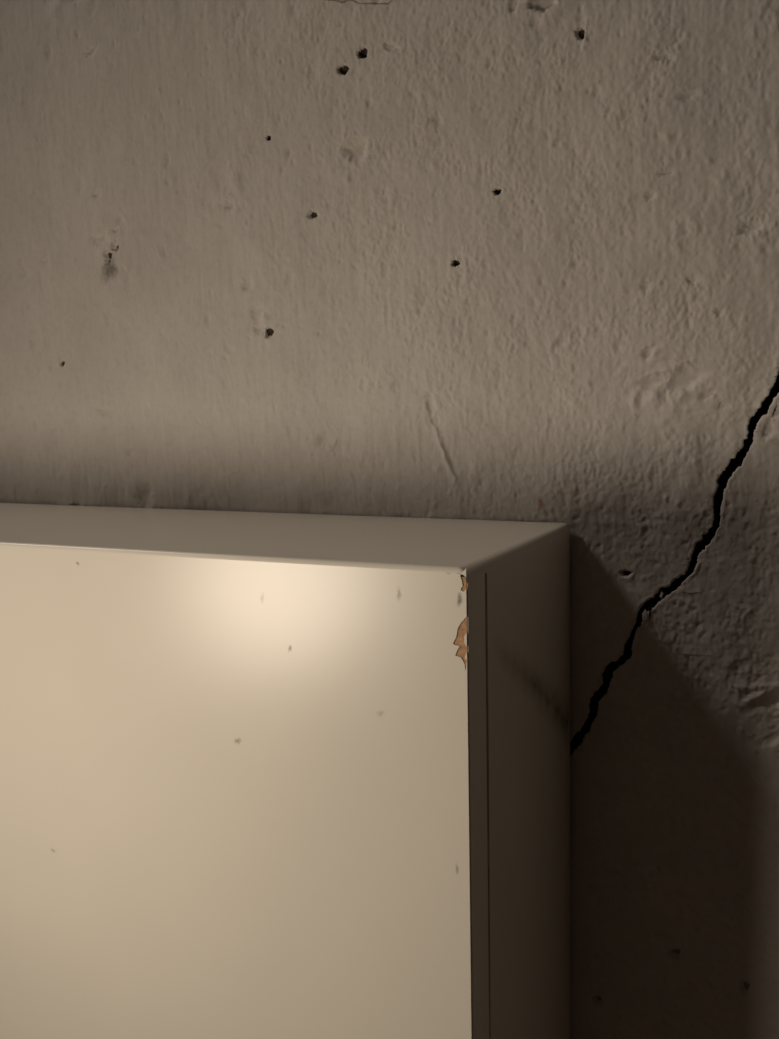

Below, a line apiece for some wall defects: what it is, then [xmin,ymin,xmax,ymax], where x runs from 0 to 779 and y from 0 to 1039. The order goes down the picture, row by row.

crack [570,361,779,762]